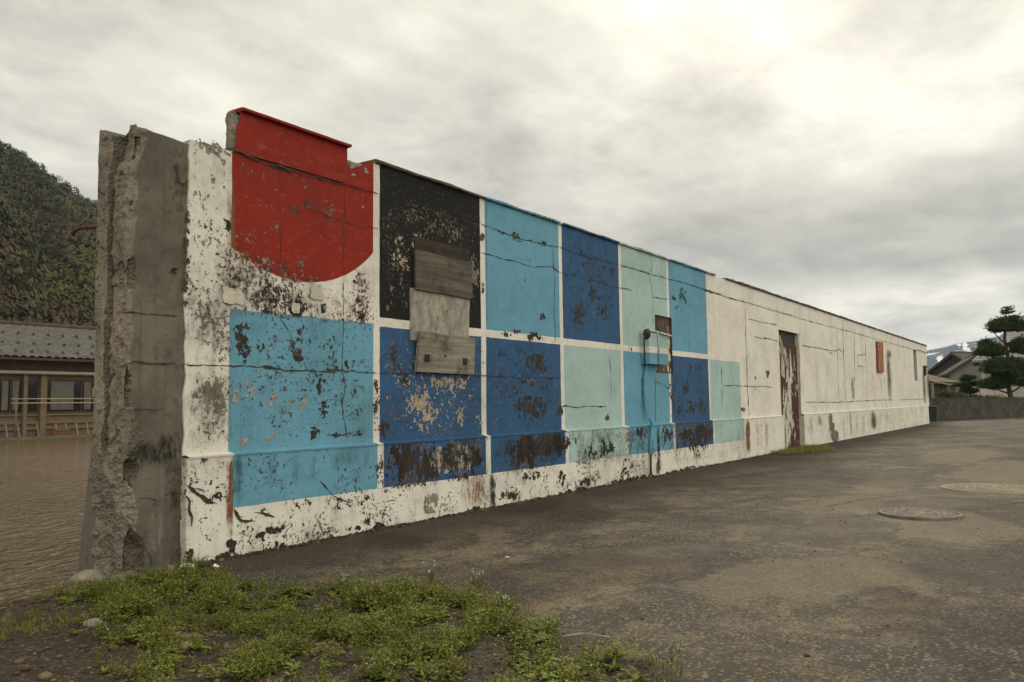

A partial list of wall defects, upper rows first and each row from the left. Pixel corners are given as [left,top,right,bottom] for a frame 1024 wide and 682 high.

crack [120,150,928,438]
peeling [182,174,569,514]
spalling [124,366,132,407]
peeling [656,327,714,452]
spalling [123,458,139,488]
spalling [603,464,712,485]
spalling [122,527,144,576]